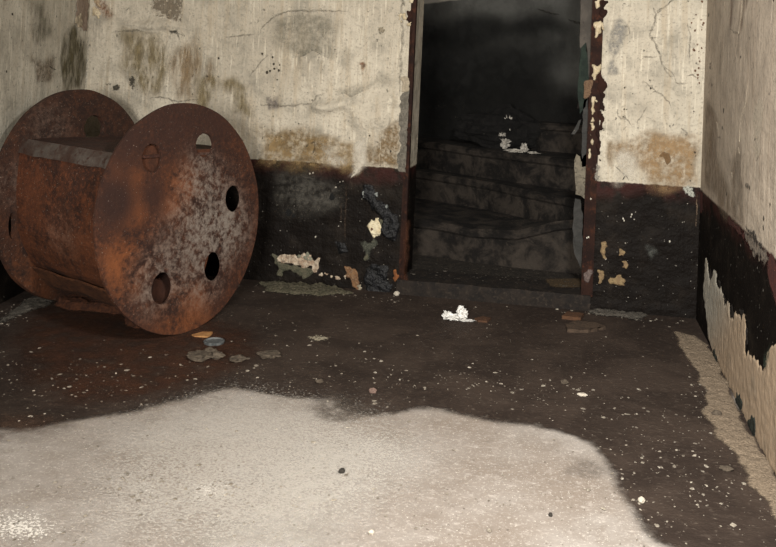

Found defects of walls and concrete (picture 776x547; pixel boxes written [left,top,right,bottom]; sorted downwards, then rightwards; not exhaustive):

damp [150,0,183,21]
peeling [593,0,608,38]
damp [125,33,199,93]
damp [198,65,246,112]
peeling [584,20,624,180]
damp [609,134,703,223]
spalling [367,218,383,238]
spalling [271,252,362,290]
spalling [583,242,628,286]
peeling [703,258,776,475]
damp [0,278,776,547]